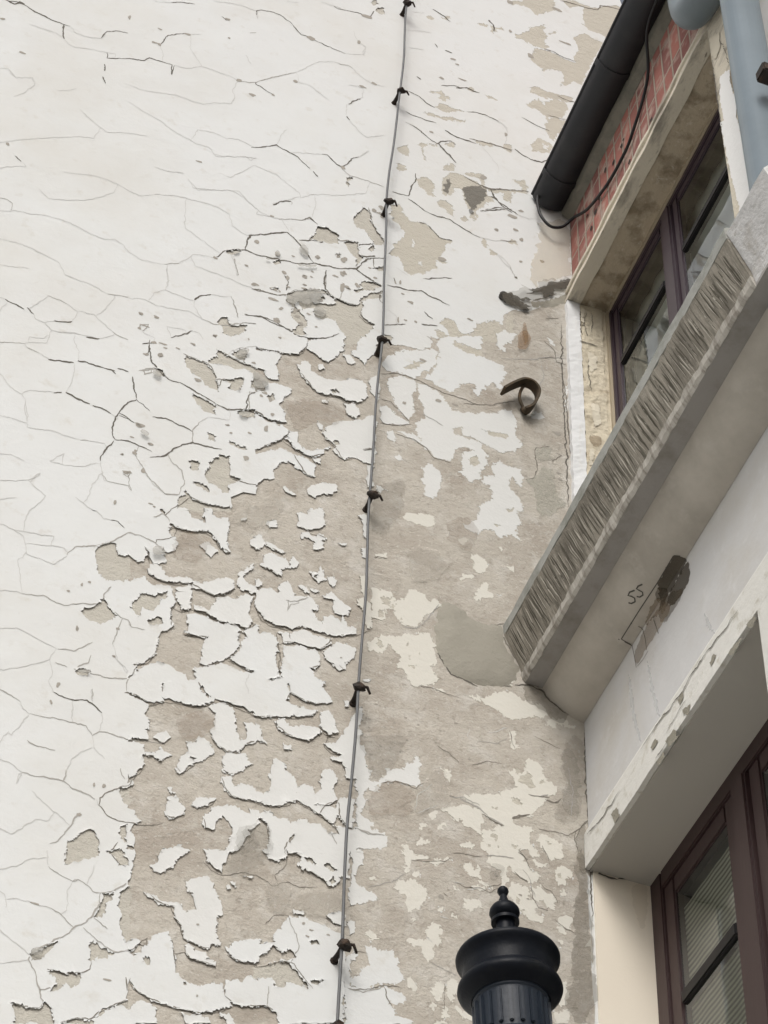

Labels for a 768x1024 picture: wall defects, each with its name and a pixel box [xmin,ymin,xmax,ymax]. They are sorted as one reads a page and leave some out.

crack [0,0,596,1022]
peeling [12,204,768,1024]
peeling [416,163,528,245]